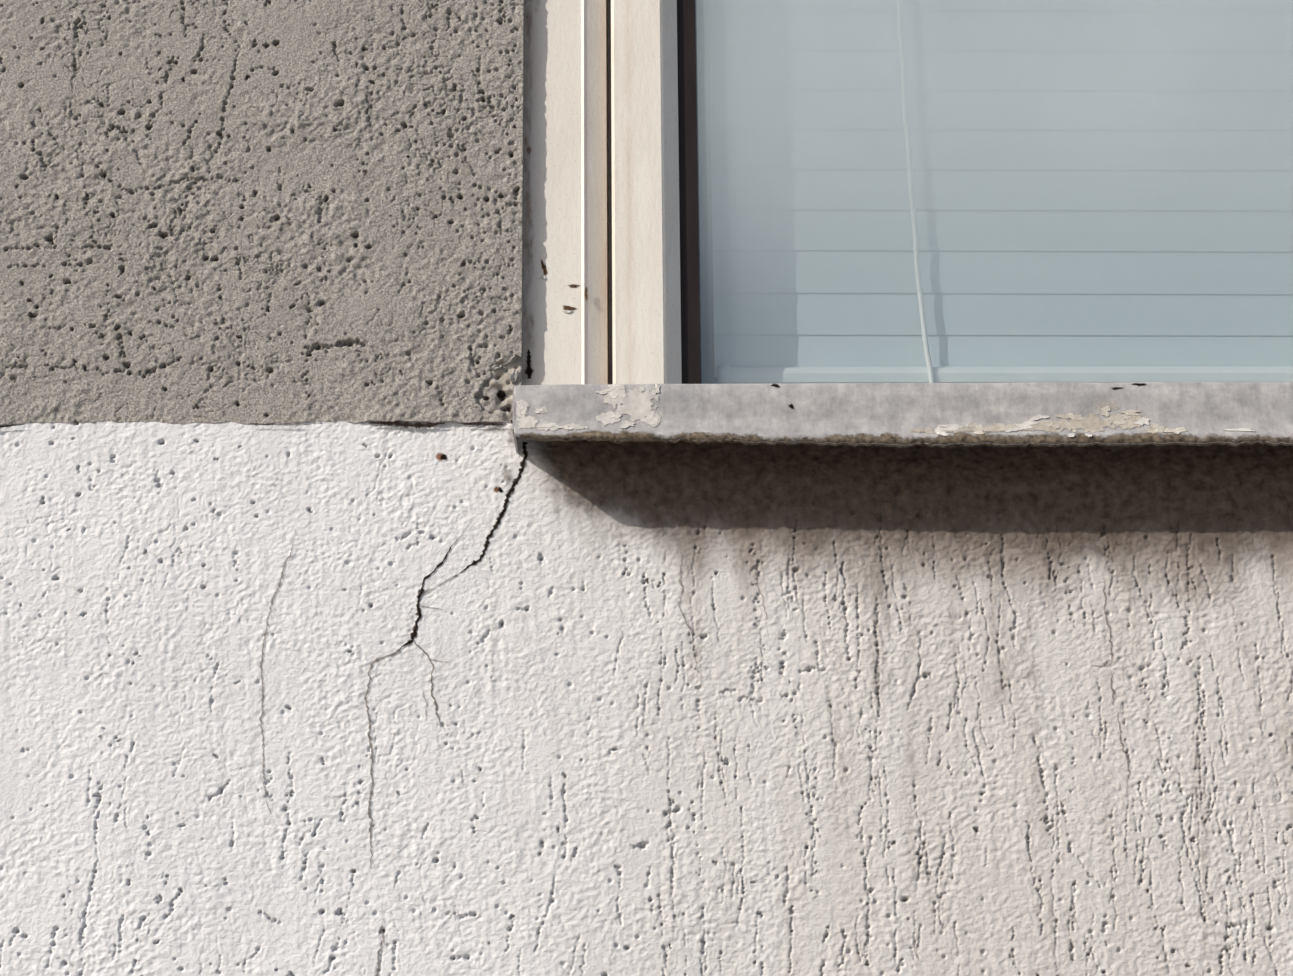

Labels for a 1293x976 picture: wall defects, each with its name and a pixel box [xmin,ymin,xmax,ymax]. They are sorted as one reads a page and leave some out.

crack [252,420,309,428]
peeling [481,354,661,431]
peeling [910,383,1188,436]
leakage [536,440,1293,571]
crack [364,421,528,865]